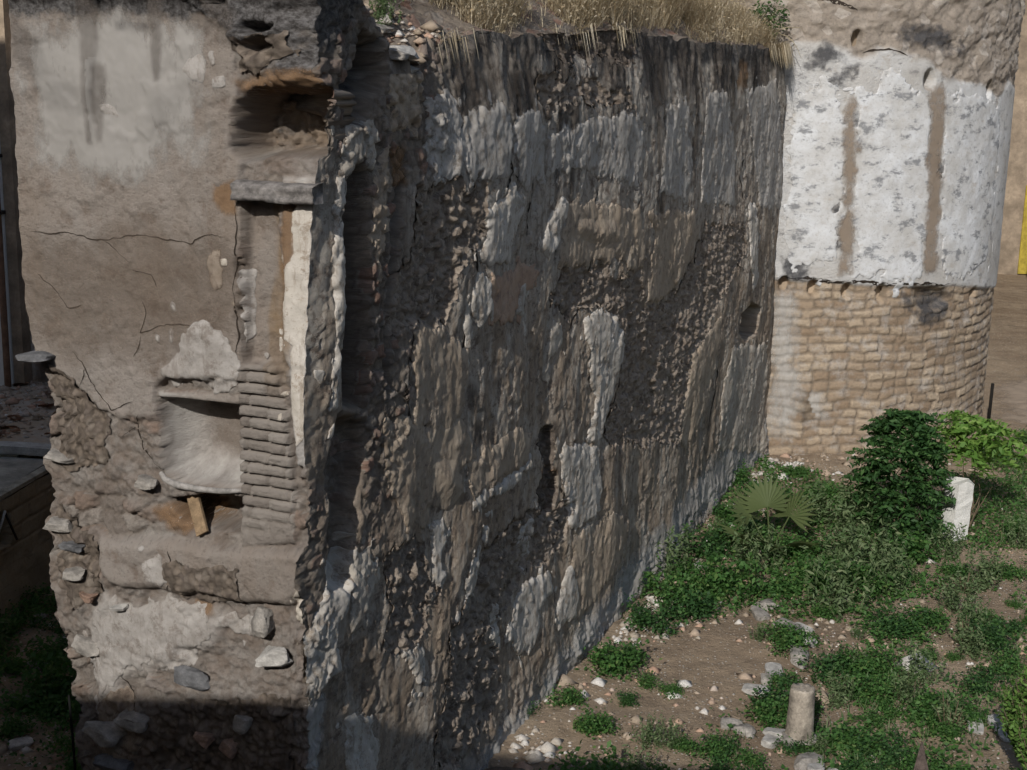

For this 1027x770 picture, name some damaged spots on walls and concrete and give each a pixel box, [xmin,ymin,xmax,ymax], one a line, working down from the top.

leakage [450,49,493,124]
leakage [643,43,703,187]
leakage [806,46,858,84]
crack [822,0,857,10]
leakage [902,25,964,54]
crack [31,201,240,357]
flaking render [207,249,258,342]
spalling [0,363,111,472]
flaking render [155,319,243,397]
spalling [264,30,1001,770]
spalling [53,504,295,770]